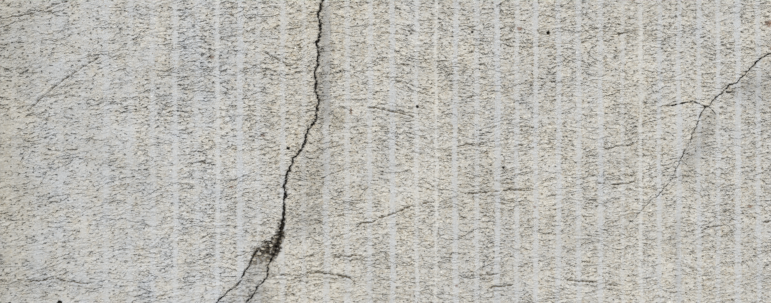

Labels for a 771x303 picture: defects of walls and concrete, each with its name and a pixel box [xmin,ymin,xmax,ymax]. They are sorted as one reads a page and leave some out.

crack [217,0,366,303]
crack [626,54,769,228]